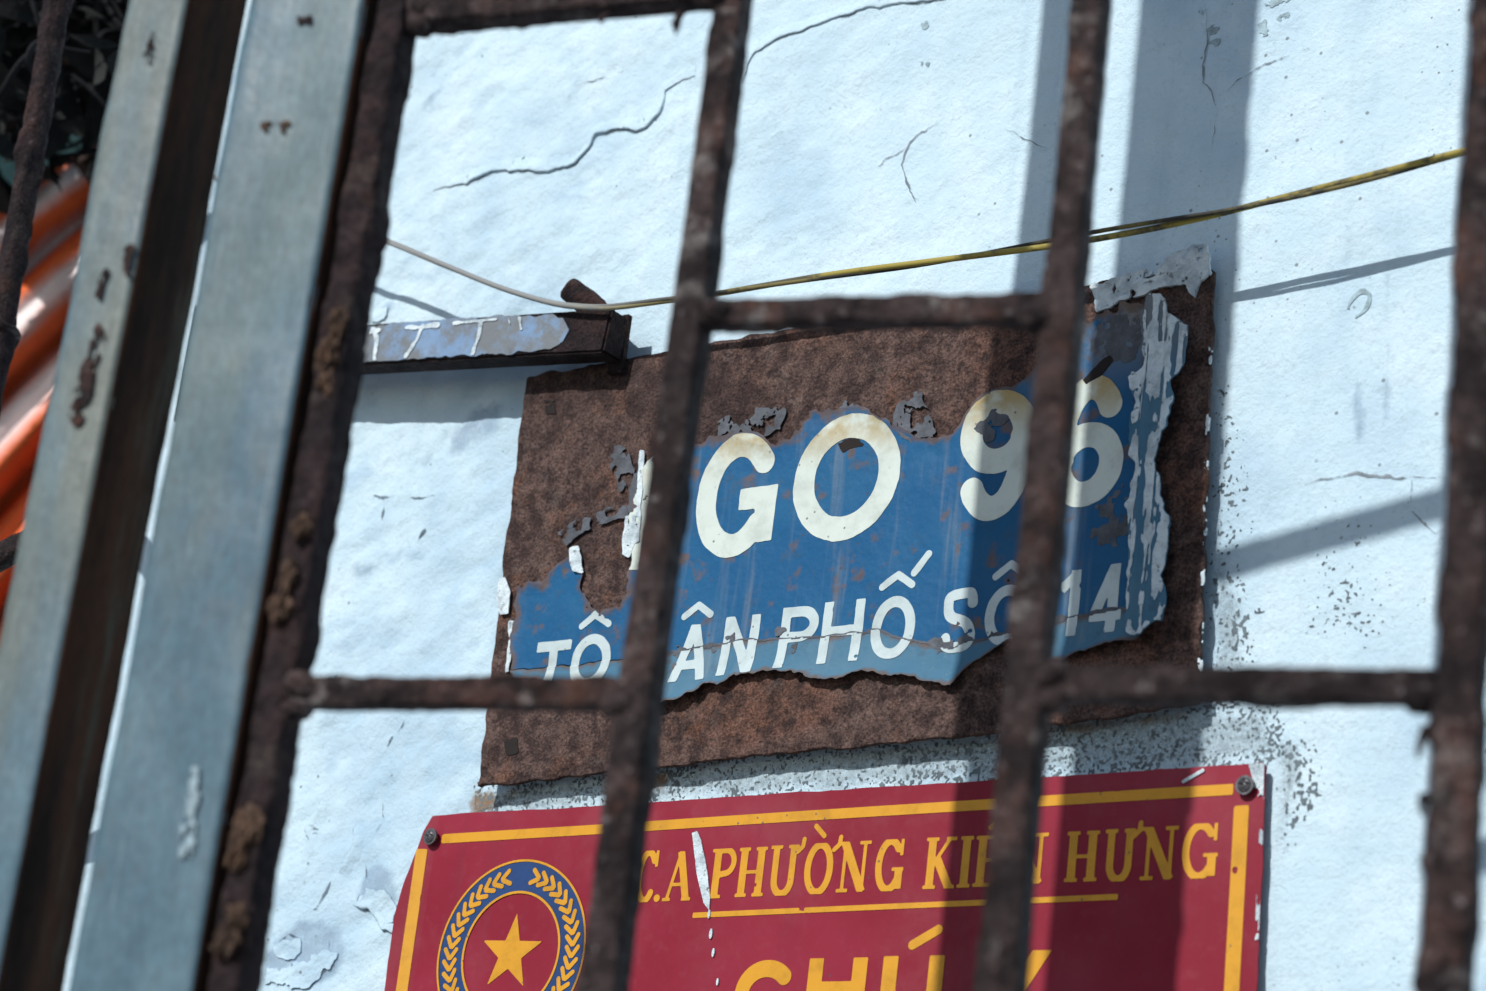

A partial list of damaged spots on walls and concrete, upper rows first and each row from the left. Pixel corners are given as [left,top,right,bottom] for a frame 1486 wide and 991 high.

crack [745,0,937,74]
crack [433,65,696,191]
crack [879,123,937,202]
peeling [359,869,397,925]
peeling [264,924,338,989]